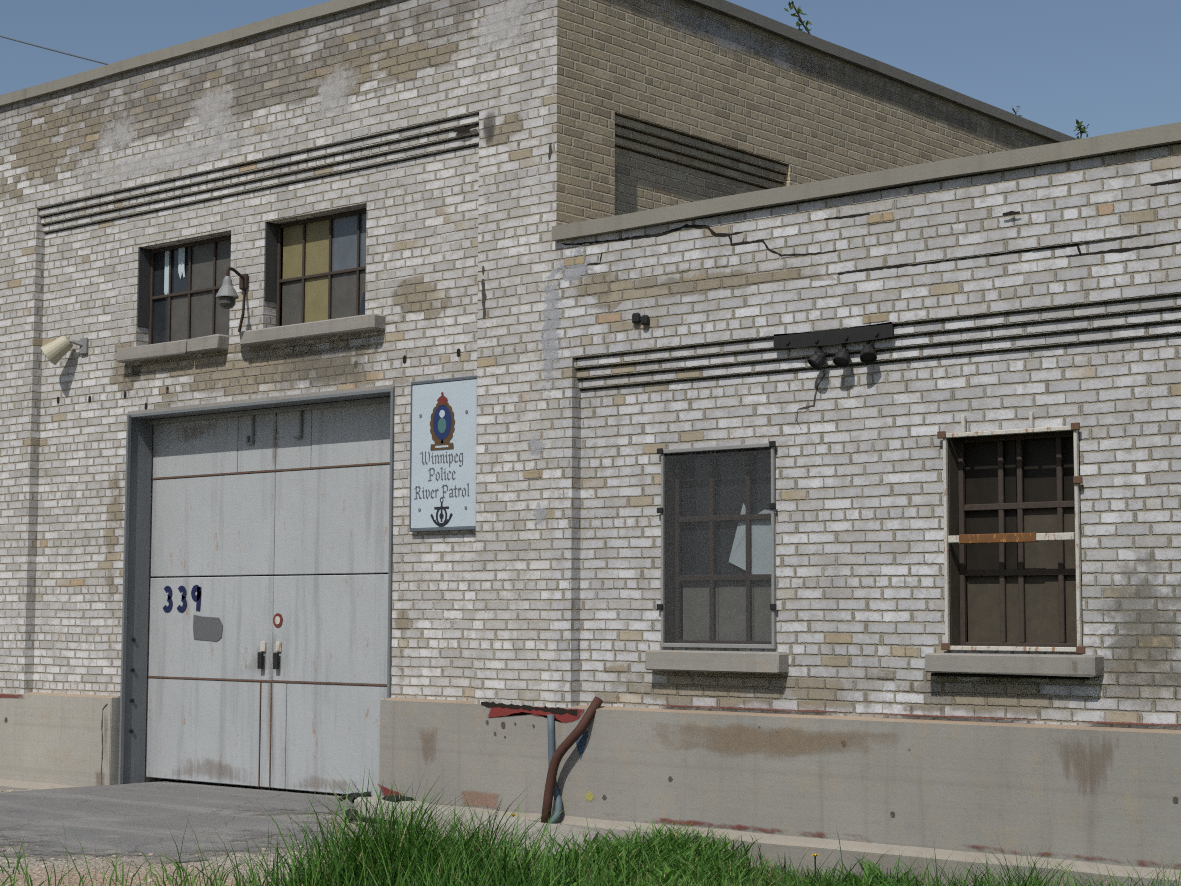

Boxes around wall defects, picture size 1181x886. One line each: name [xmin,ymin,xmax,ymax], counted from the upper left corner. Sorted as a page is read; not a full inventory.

crack [562,224,1181,274]
spalling [481,701,584,738]
damp [713,727,853,753]